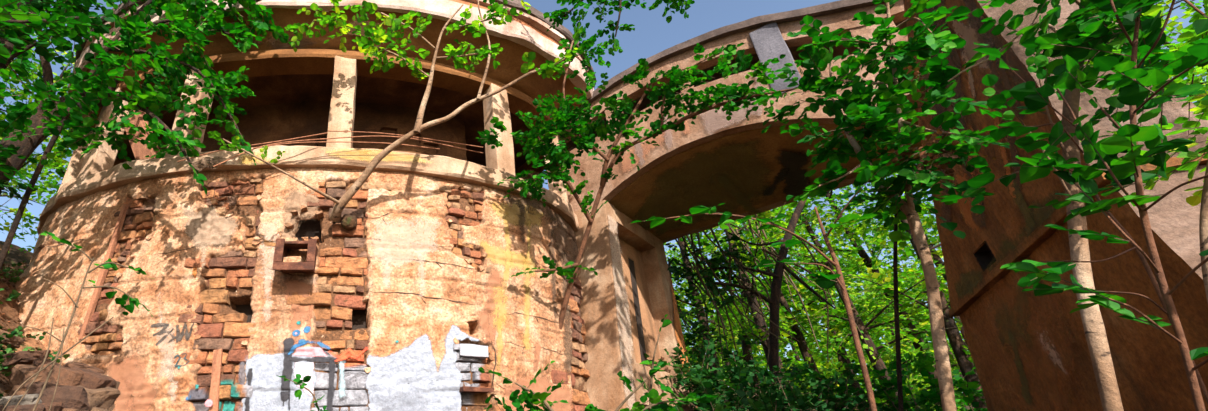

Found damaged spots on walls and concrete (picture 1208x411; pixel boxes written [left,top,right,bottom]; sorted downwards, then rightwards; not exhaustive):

spalling [77,193,157,355]
spalling [172,178,392,411]
spalling [439,185,502,411]
spalling [551,276,590,411]